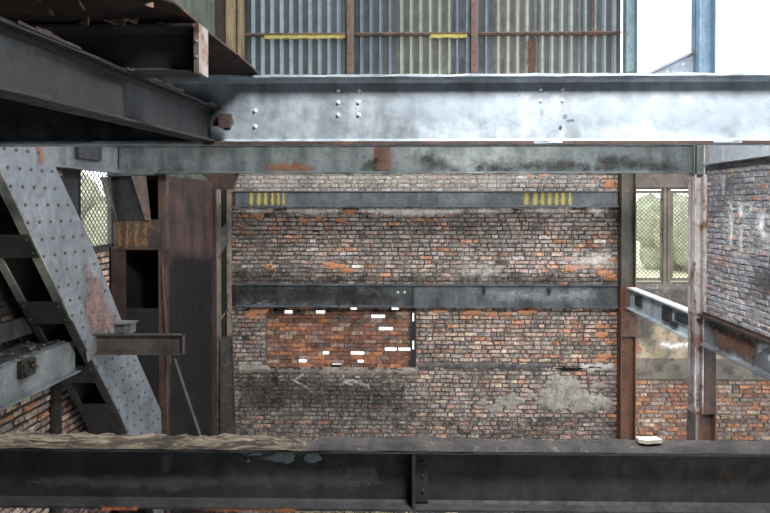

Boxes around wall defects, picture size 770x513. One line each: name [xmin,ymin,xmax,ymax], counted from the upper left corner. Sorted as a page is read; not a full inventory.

rust [527,38,536,73]
spalling [580,324,616,372]
rust [713,326,756,362]
peeling [236,360,548,376]
peeling [477,374,617,413]